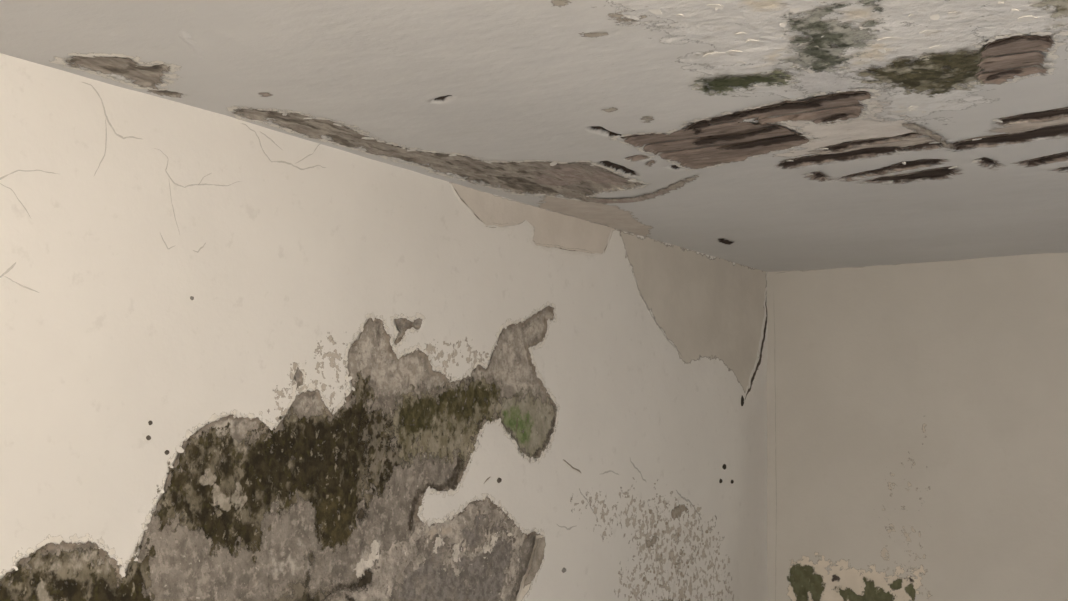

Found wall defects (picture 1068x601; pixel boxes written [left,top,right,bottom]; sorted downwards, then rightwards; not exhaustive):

peeling [607,0,1068,184]
damp [690,0,990,97]
damp [1030,0,1068,31]
crack [741,290,767,406]
damp [0,336,504,601]
peeling [786,552,931,601]